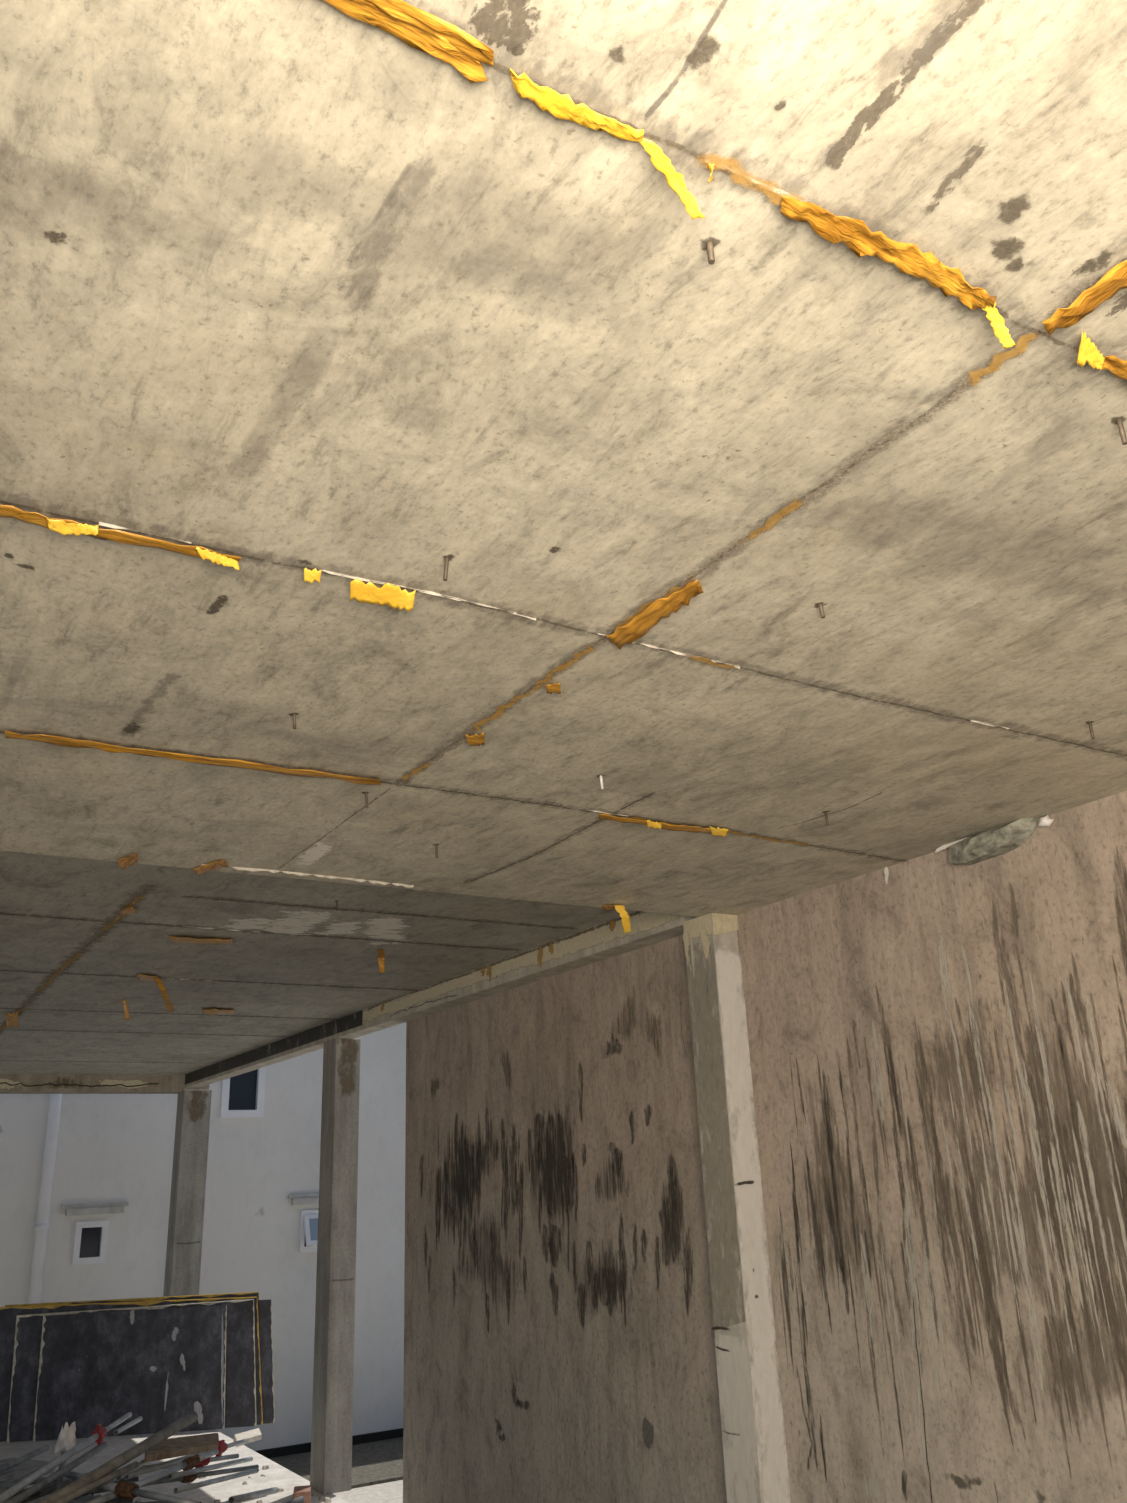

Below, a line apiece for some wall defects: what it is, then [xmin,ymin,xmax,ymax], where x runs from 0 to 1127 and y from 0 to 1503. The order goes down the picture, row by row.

damp [610,47,624,62]
damp [338,1039,358,1094]
damp [363,851,1127,1503]